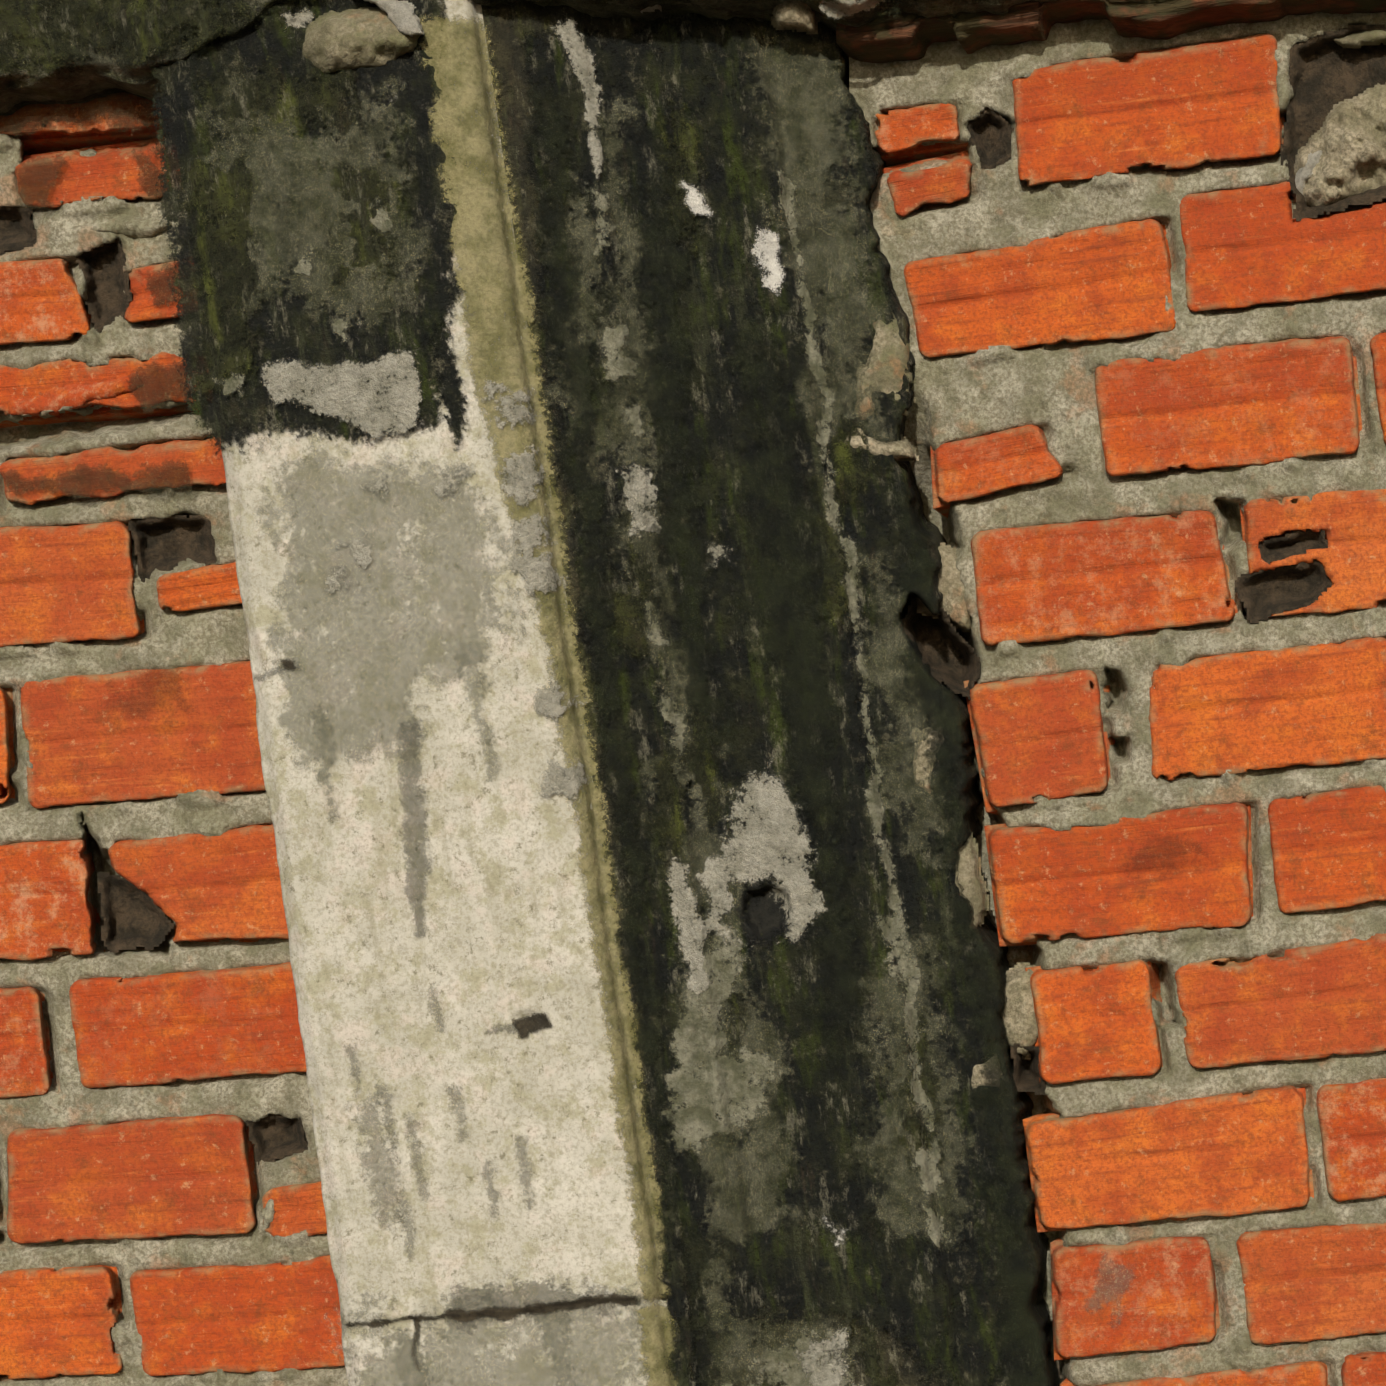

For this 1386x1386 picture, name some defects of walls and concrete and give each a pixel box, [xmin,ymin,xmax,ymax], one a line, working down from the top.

spalling [1281,24,1386,221]
water stain [324,532,373,594]
spalling [1235,529,1332,623]
water stain [519,0,1065,1386]
crack [346,1273,730,1372]